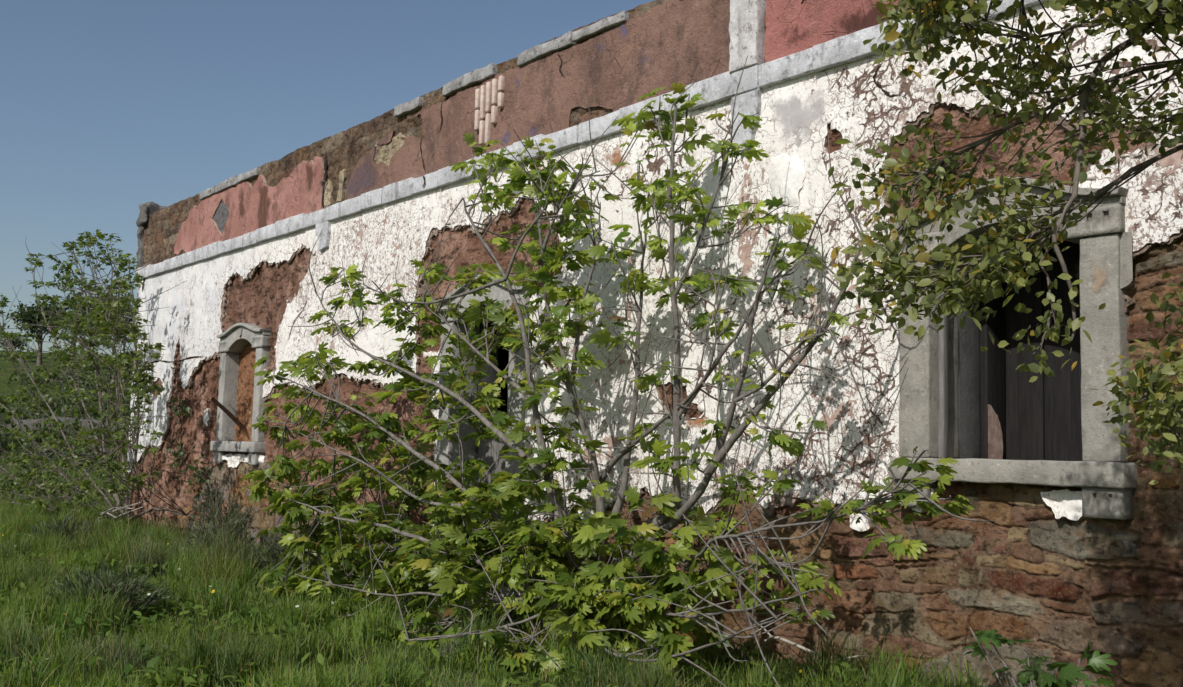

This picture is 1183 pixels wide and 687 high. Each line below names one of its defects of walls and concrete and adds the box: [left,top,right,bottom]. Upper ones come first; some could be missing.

spalling [887,102,947,157]
spalling [961,105,1079,132]
spalling [215,244,315,332]
peeling [339,212,400,259]
spalling [411,189,530,298]
crack [606,44,939,497]
peeling [799,280,858,325]
spalling [1132,224,1183,260]
spalling [414,312,440,373]
spalling [128,326,220,475]
peeling [820,390,857,432]
spalling [705,475,839,517]